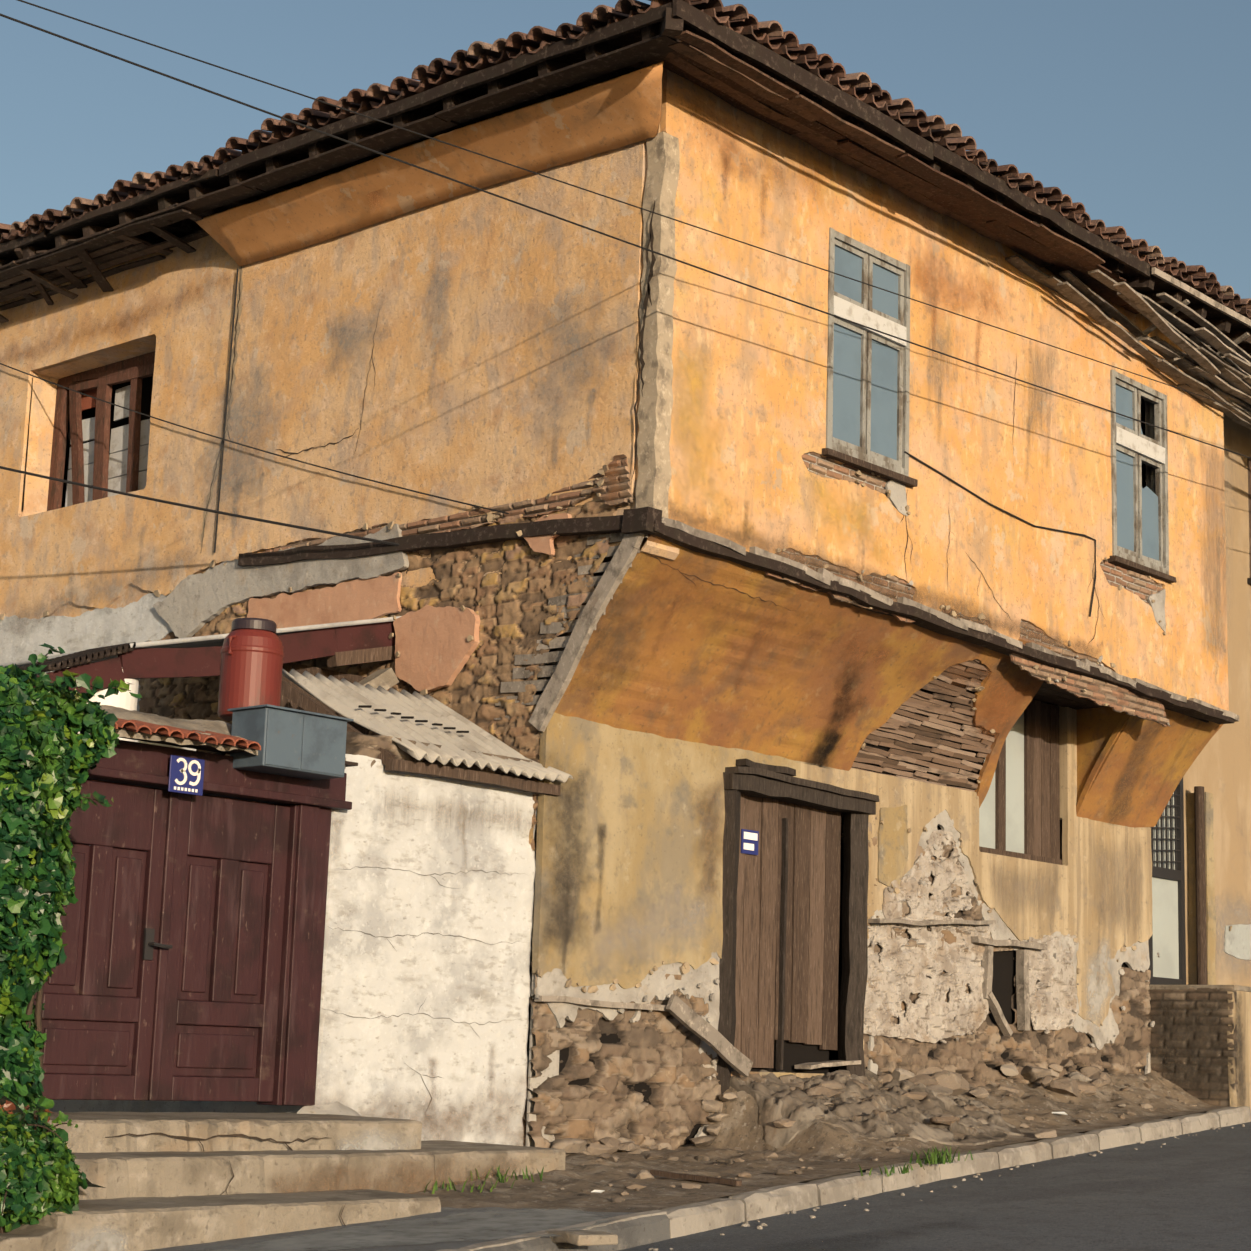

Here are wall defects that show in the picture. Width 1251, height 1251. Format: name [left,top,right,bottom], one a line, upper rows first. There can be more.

crack [276,309,380,460]
crack [632,201,656,477]
flaking render [802,452,911,516]
flaking render [0,454,635,696]
damp [819,736,838,767]
flaking render [851,659,996,792]
crack [321,997,520,1037]
crack [327,926,519,949]
crack [344,866,524,889]
damp [547,784,582,951]
flaking render [534,952,720,1030]
peeling [863,805,1160,1075]